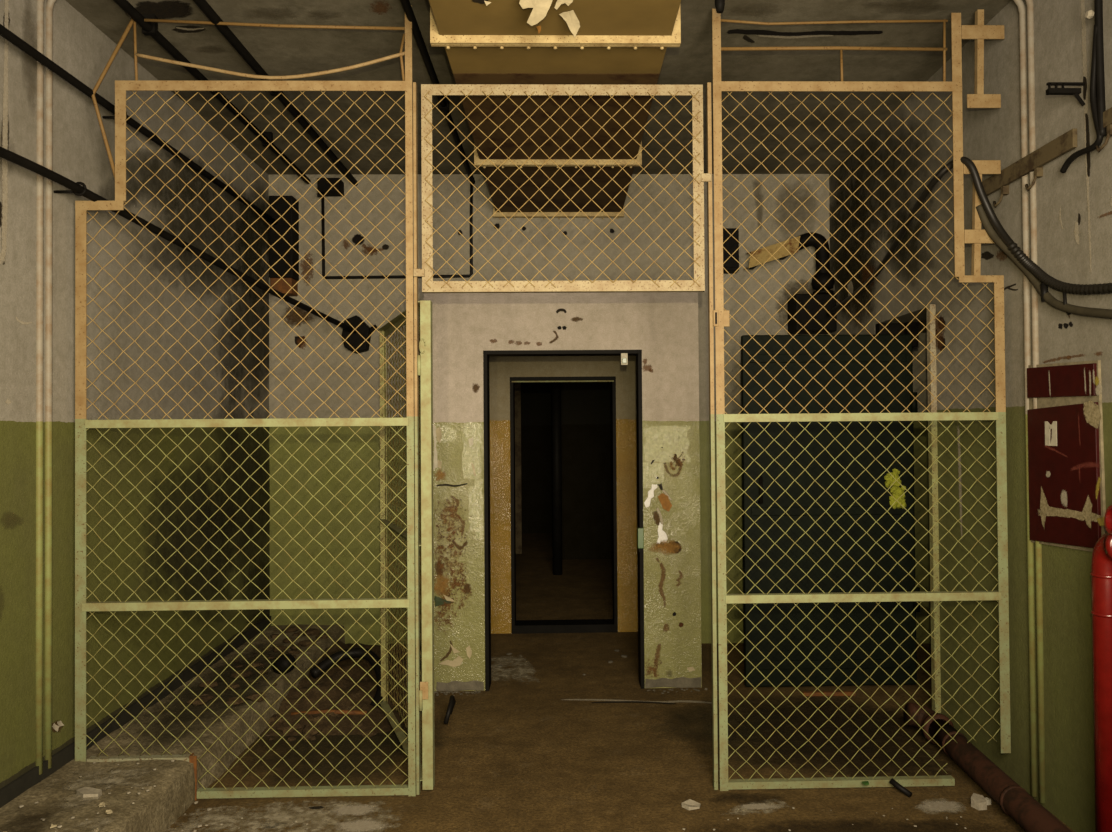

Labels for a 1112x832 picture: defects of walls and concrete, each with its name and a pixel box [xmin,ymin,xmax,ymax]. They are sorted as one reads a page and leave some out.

peeling [519,0,580,37]
peeling [644,477,672,544]
peeling [434,595,455,607]
peeling [439,641,472,667]
flaking render [436,680,484,691]